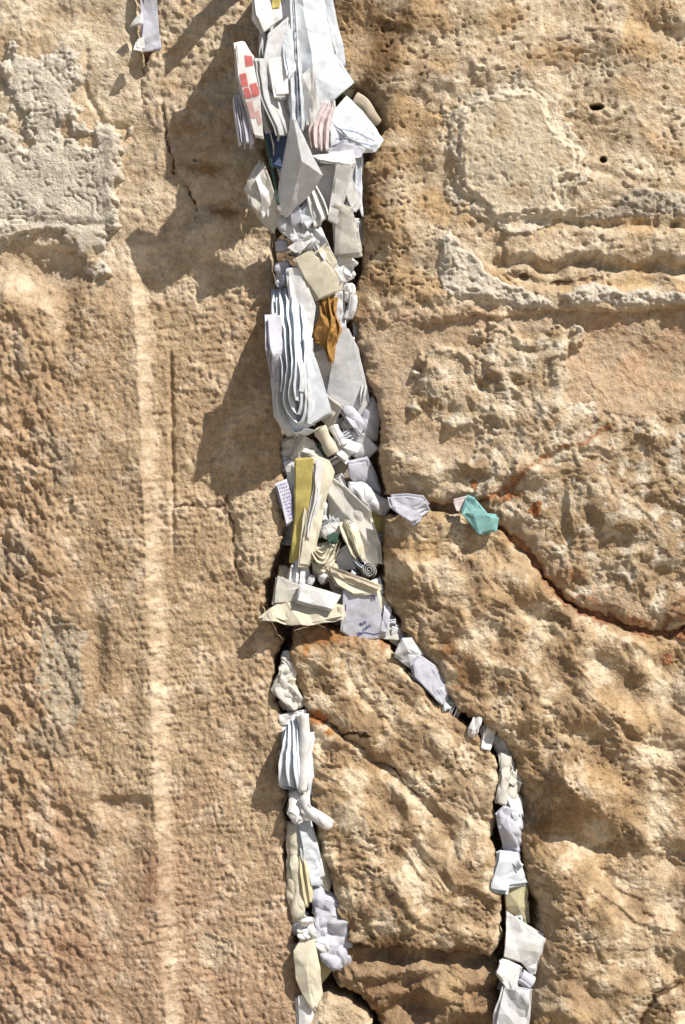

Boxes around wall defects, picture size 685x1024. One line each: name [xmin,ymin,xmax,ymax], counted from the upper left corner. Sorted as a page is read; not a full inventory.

peeling [0,40,134,285]
crack [163,110,210,218]
crack [488,512,685,665]